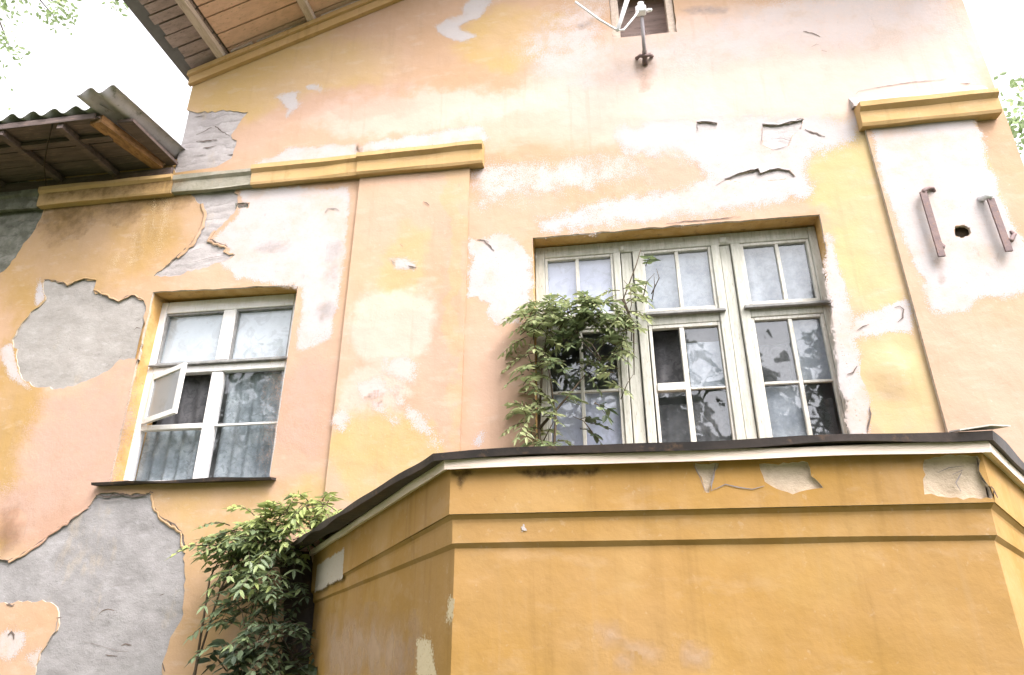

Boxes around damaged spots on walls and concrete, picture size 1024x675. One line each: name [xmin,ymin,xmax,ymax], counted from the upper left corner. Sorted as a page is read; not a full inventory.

peeling [435,0,494,43]
spalling [175,110,247,173]
spalling [0,209,44,273]
peeling [155,185,352,351]
peeling [466,107,1024,434]
spalling [0,277,186,675]
spalling [695,463,718,493]
spalling [759,462,822,494]
spalling [923,455,988,500]
peeling [315,547,344,592]